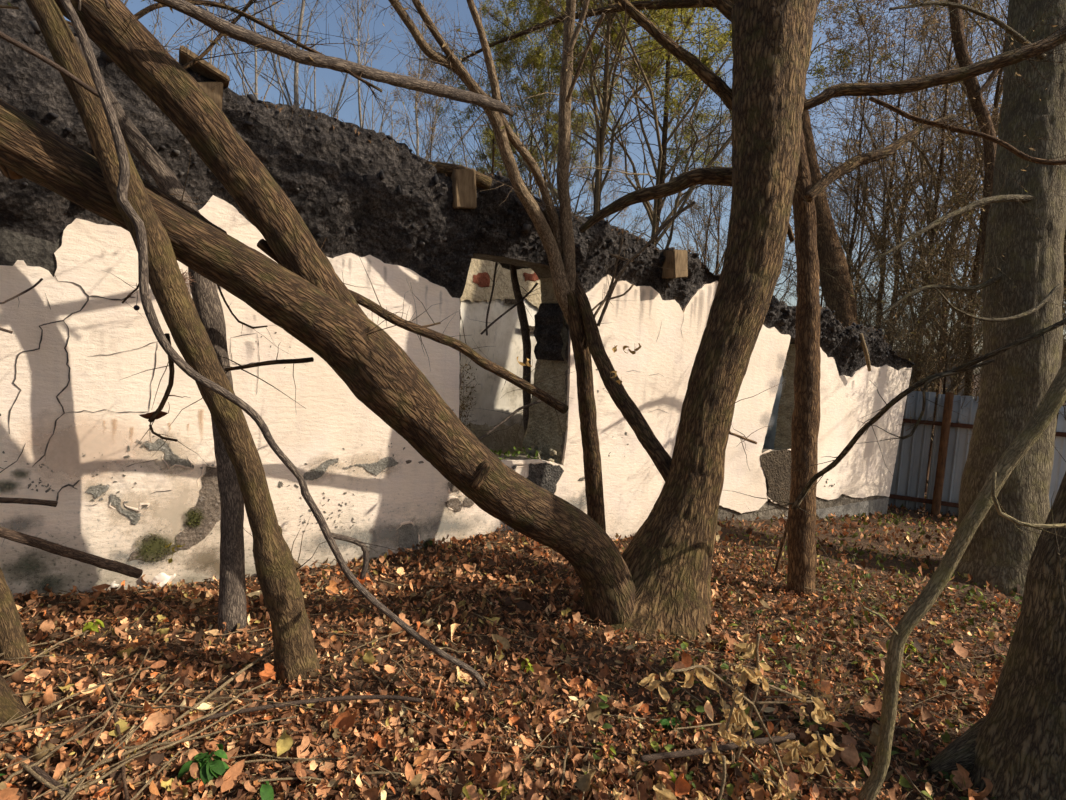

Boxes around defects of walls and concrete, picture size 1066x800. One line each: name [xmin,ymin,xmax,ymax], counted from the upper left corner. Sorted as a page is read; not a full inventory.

flaking render [0,227,63,277]
flaking render [473,272,490,287]
crack [0,276,158,473]
crack [230,333,260,395]
water stain [0,470,28,492]
crack [56,480,97,506]
water stain [8,553,59,593]